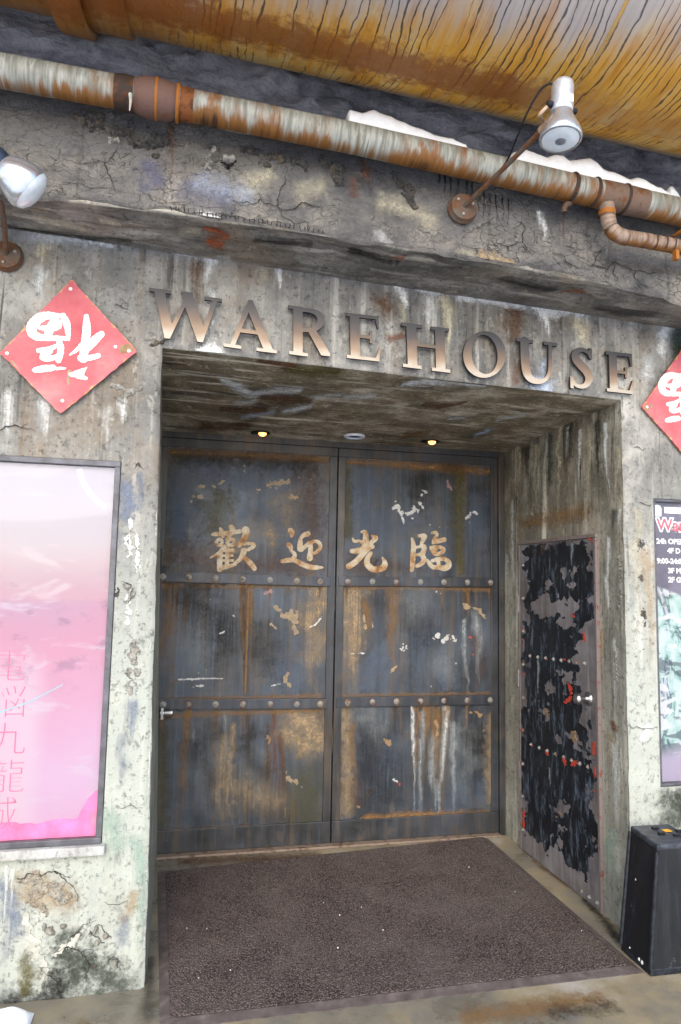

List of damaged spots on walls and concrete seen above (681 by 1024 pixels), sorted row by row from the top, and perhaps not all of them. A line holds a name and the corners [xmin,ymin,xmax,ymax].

rust [113,73,135,113]
rust [170,86,194,137]
crack [68,147,118,190]
crack [169,170,324,233]
crack [486,219,664,289]
peeling [256,476,312,500]
peeling [392,490,428,524]
water stain [511,420,621,608]
rust [160,698,324,796]
water stain [411,706,455,778]
spalling [13,870,85,994]
water stain [37,931,133,1000]